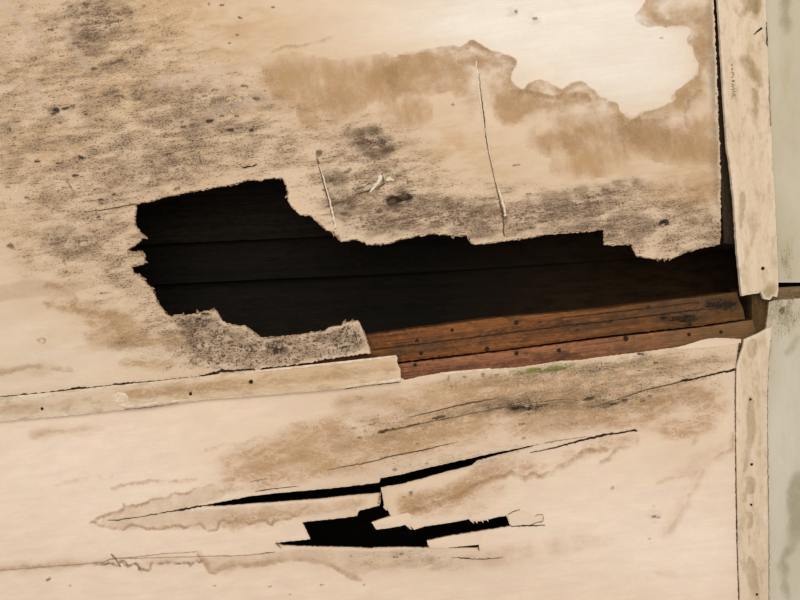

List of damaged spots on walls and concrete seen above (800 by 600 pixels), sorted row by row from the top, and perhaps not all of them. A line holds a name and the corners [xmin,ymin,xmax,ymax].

mould [71,1,132,48]
crack [475,61,506,236]
crack [316,158,337,229]
mould [323,171,491,236]
mould [508,186,648,236]
crack [0,368,255,397]
mould [175,313,361,367]
peeling [255,355,396,372]
peeling [675,338,741,349]
crack [378,398,567,433]
damp [297,374,721,475]
crack [330,442,456,470]